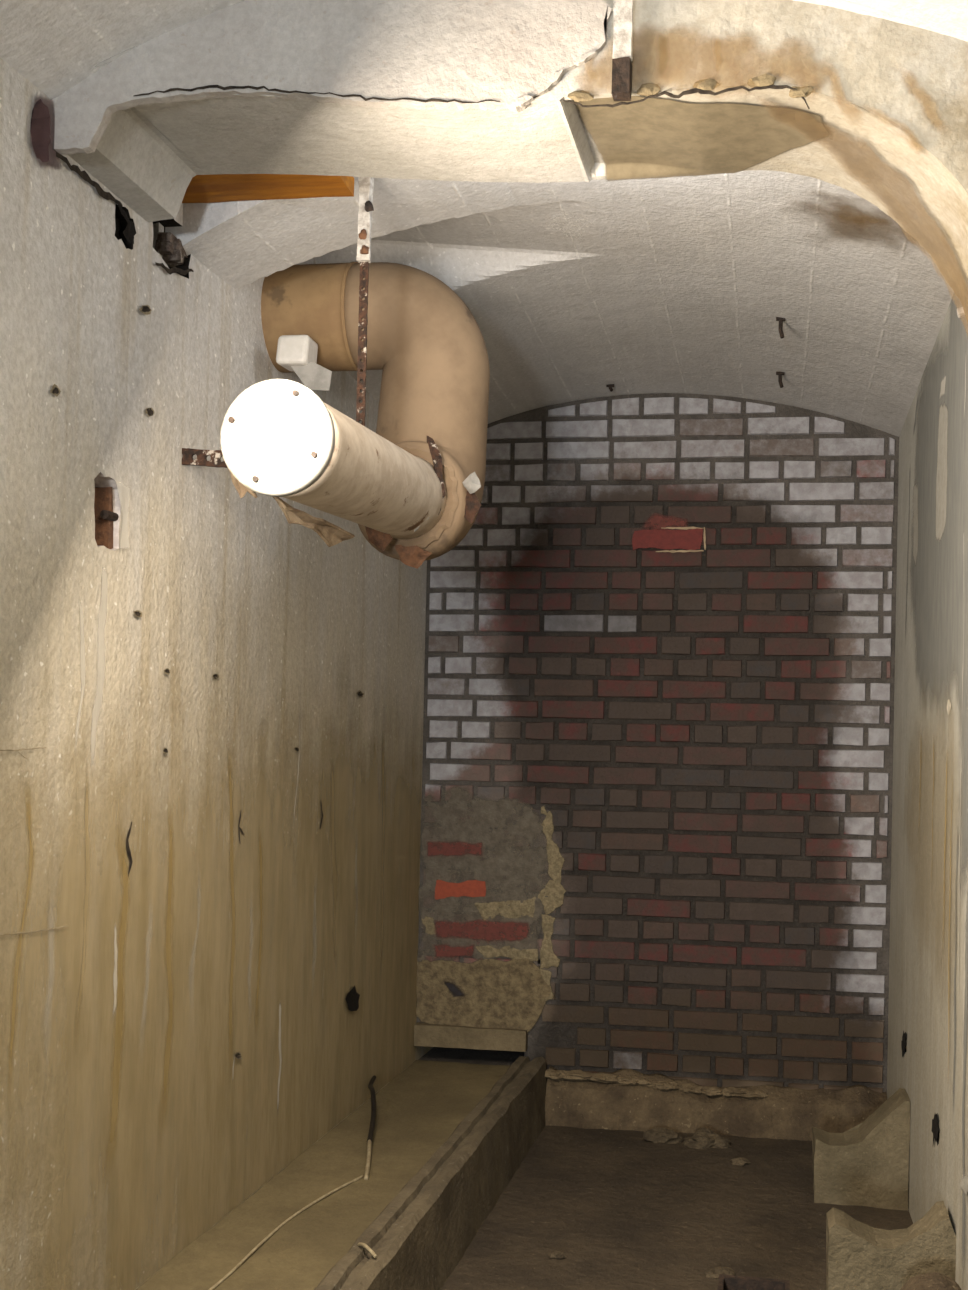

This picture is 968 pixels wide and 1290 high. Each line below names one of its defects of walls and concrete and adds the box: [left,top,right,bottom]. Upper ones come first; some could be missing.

leakage [573,96,823,181]
leakage [905,296,968,1259]
flaking render [422,806,566,1001]